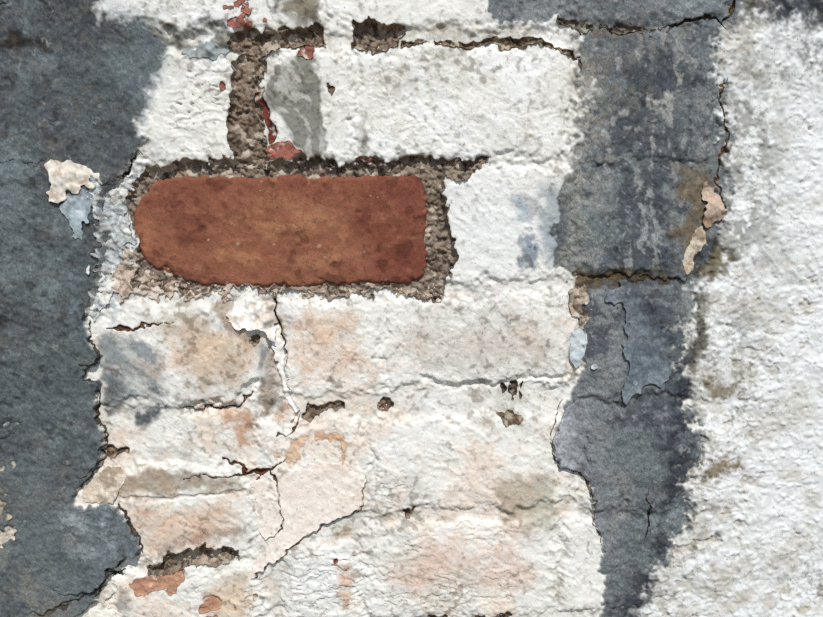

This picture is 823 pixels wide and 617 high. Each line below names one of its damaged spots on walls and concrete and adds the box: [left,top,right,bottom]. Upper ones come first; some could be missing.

crack [662,0,736,33]
damp [773,0,823,17]
crack [714,78,730,209]
flaking render [44,86,491,420]
peeling [682,181,728,275]
flaking render [563,271,592,368]
damp [690,293,708,373]
crack [81,320,174,488]
crack [183,390,254,410]
peeling [45,466,142,617]
flaking render [129,543,240,596]
crack [183,457,367,579]